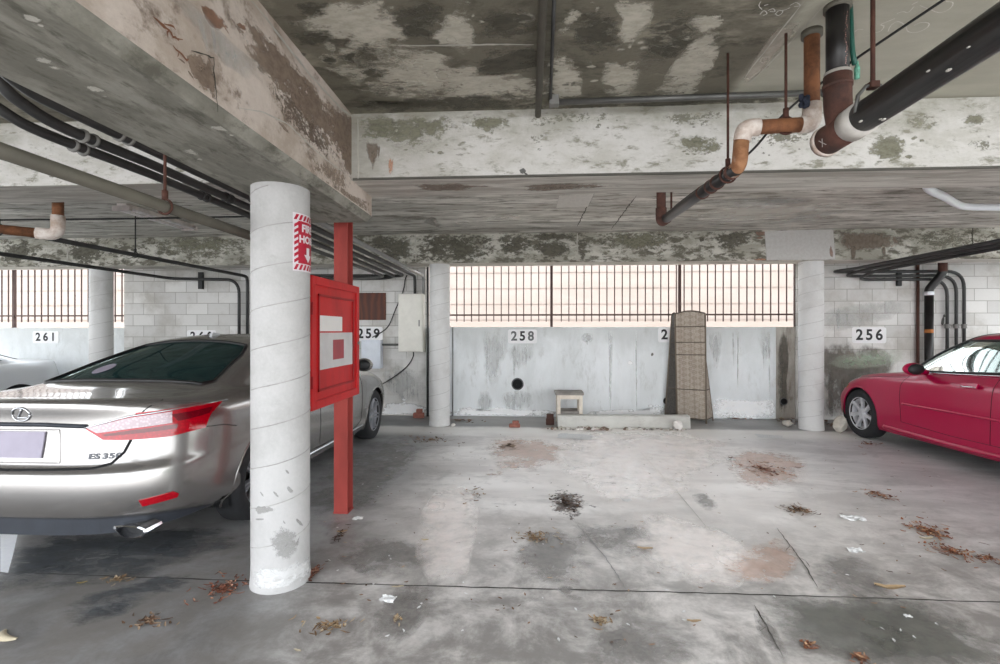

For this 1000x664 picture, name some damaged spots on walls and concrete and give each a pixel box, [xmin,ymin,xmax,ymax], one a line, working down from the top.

crack [154,17,218,110]
peeling [180,54,216,99]
water stain [391,3,443,39]
water stain [476,9,537,76]
water stain [641,10,699,62]
peeling [201,6,369,212]
water stain [358,86,799,169]
water stain [368,216,587,261]
water stain [598,233,673,255]
water stain [824,345,892,414]
peeling [271,519,303,559]
crack [777,528,817,586]